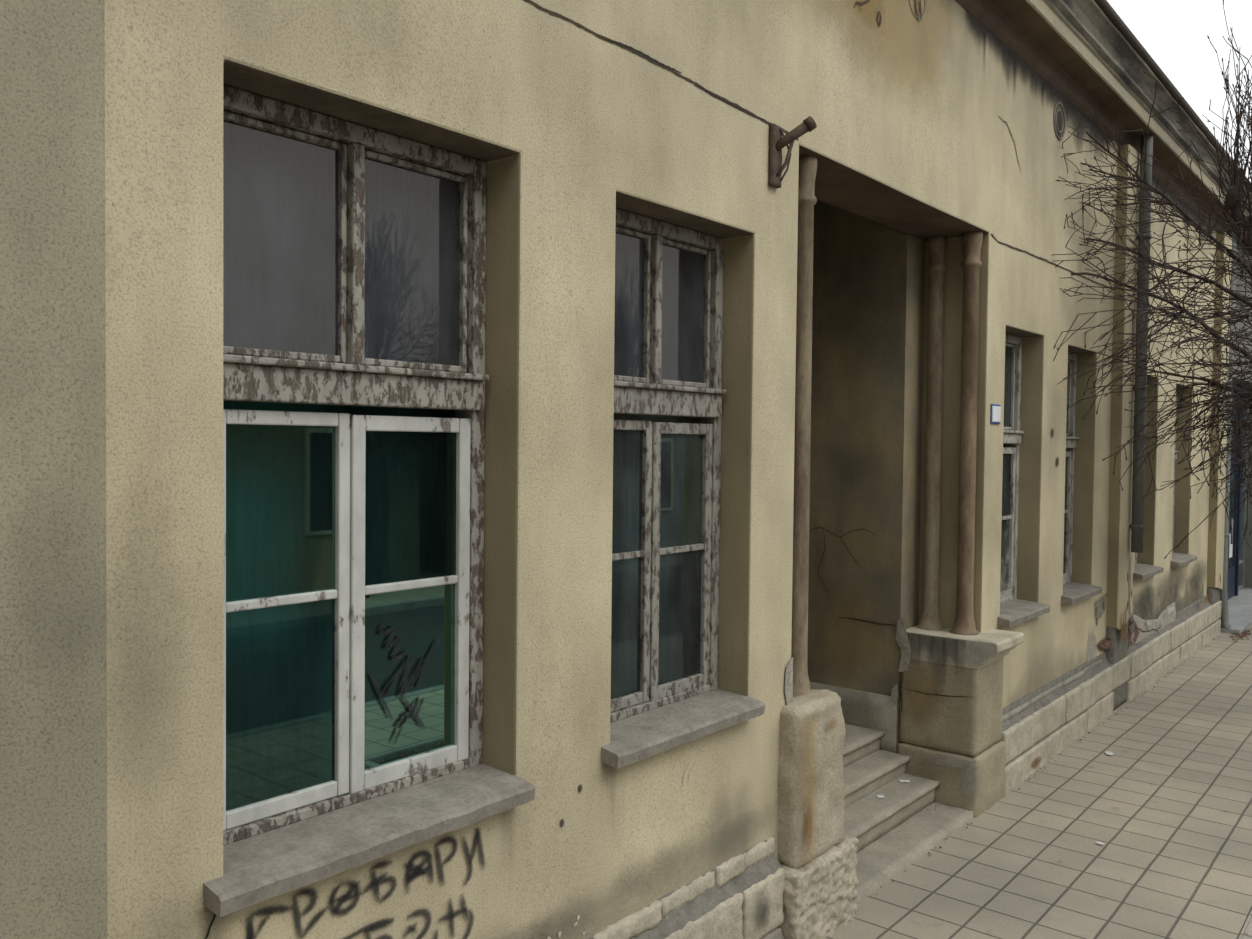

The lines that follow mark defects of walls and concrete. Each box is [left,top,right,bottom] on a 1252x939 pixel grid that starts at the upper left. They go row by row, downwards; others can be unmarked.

leakage [967,10,1111,146]
crack [809,527,967,713]
spalling [891,611,911,705]
peeling [1127,559,1176,644]
crack [205,914,216,939]